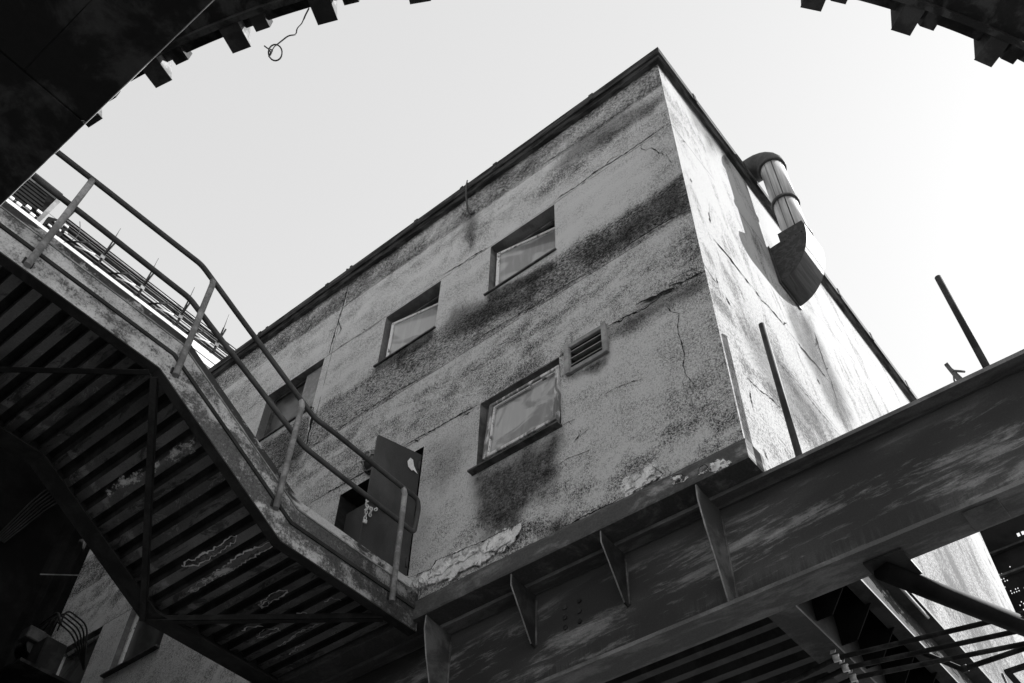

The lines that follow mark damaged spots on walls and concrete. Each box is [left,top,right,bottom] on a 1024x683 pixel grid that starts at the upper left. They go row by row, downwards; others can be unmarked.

crack [517,79,685,201]
water stain [376,331,433,370]
water stain [450,262,553,334]
crack [609,299,694,413]
crack [622,212,838,432]
water stain [476,436,557,531]
flaking render [620,459,733,498]
flaking render [406,520,525,588]